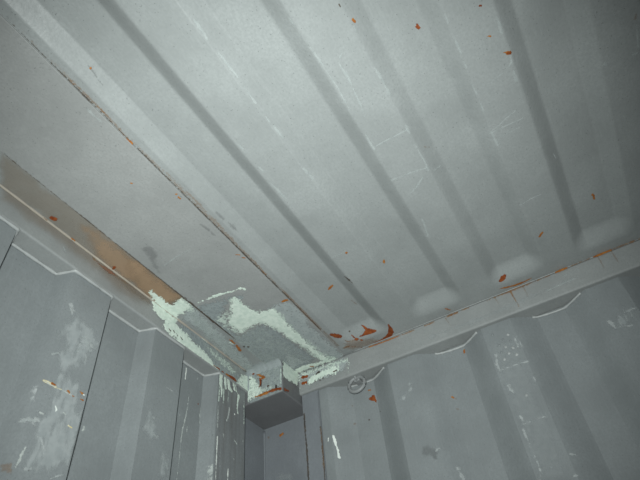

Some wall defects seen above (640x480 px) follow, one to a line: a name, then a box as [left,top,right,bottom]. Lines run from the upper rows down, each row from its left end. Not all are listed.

corrosion [494,274,547,302]
peeling [148,287,349,403]
corrosion [330,325,376,348]
corrosion [367,324,411,348]